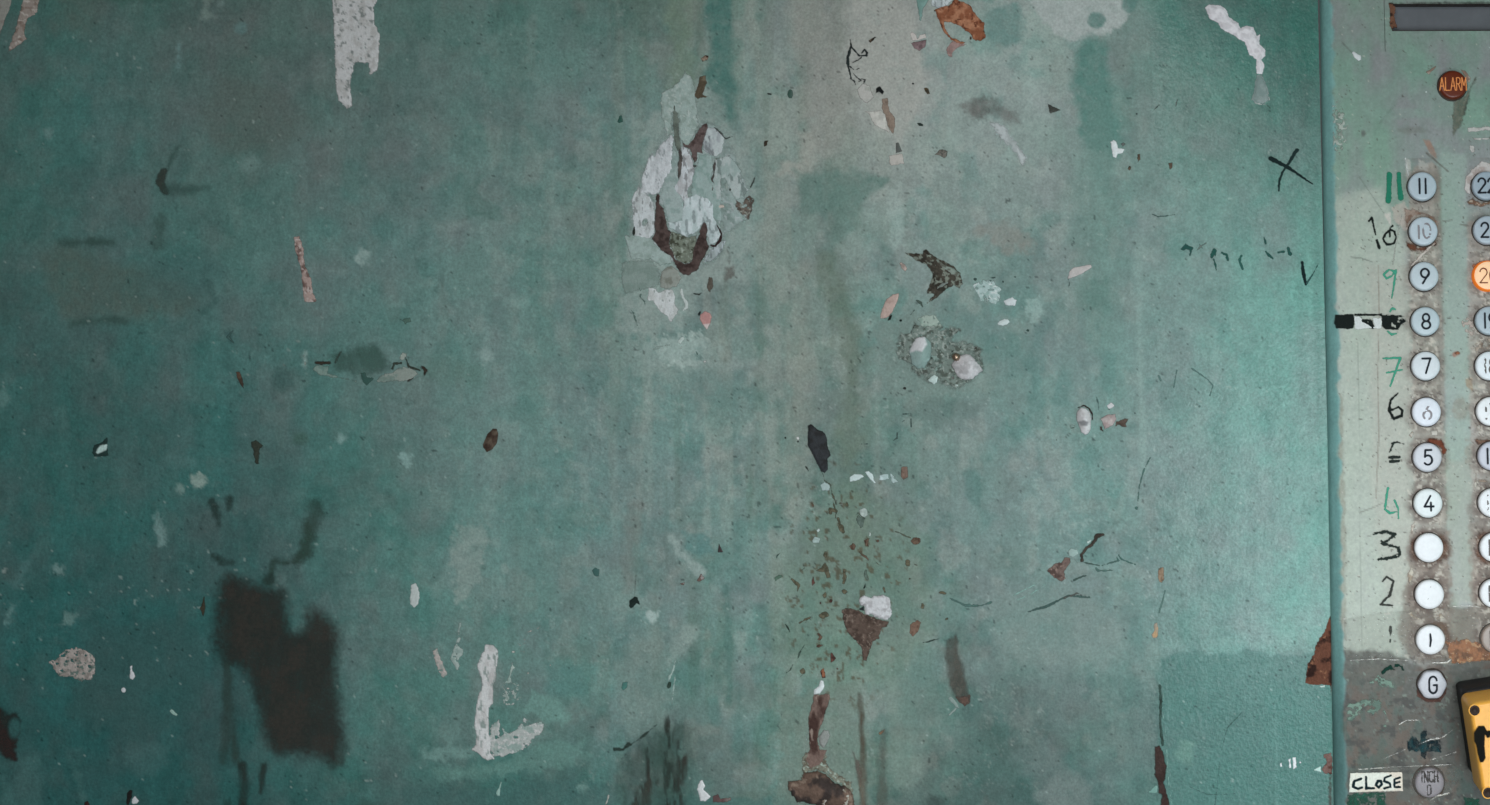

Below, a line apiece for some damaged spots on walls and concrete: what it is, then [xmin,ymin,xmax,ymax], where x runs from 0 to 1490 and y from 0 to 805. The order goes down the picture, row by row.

peeling [0,0,39,51]
peeling [332,0,380,108]
corrosion [917,0,986,57]
peeling [622,55,755,329]
spalling [880,293,983,390]
spalling [49,647,95,681]
water stain [212,556,343,805]
flaking render [472,627,539,760]
corrosion [1305,616,1332,691]
water stain [613,720,686,805]